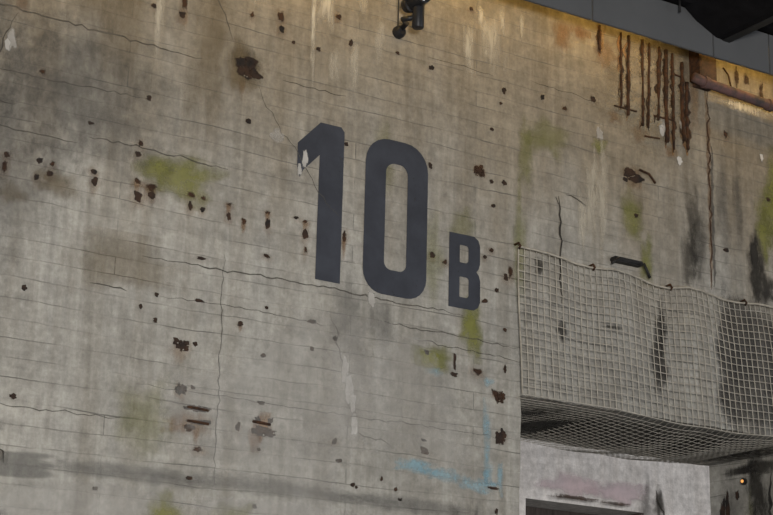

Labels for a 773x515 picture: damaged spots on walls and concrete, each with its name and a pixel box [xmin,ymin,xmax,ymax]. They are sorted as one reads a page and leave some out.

spalling [231,48,263,85]
spalling [608,32,692,166]
corrosion [134,178,157,202]
crack [556,195,586,303]
water stain [750,222,773,303]
water stain [651,305,666,386]